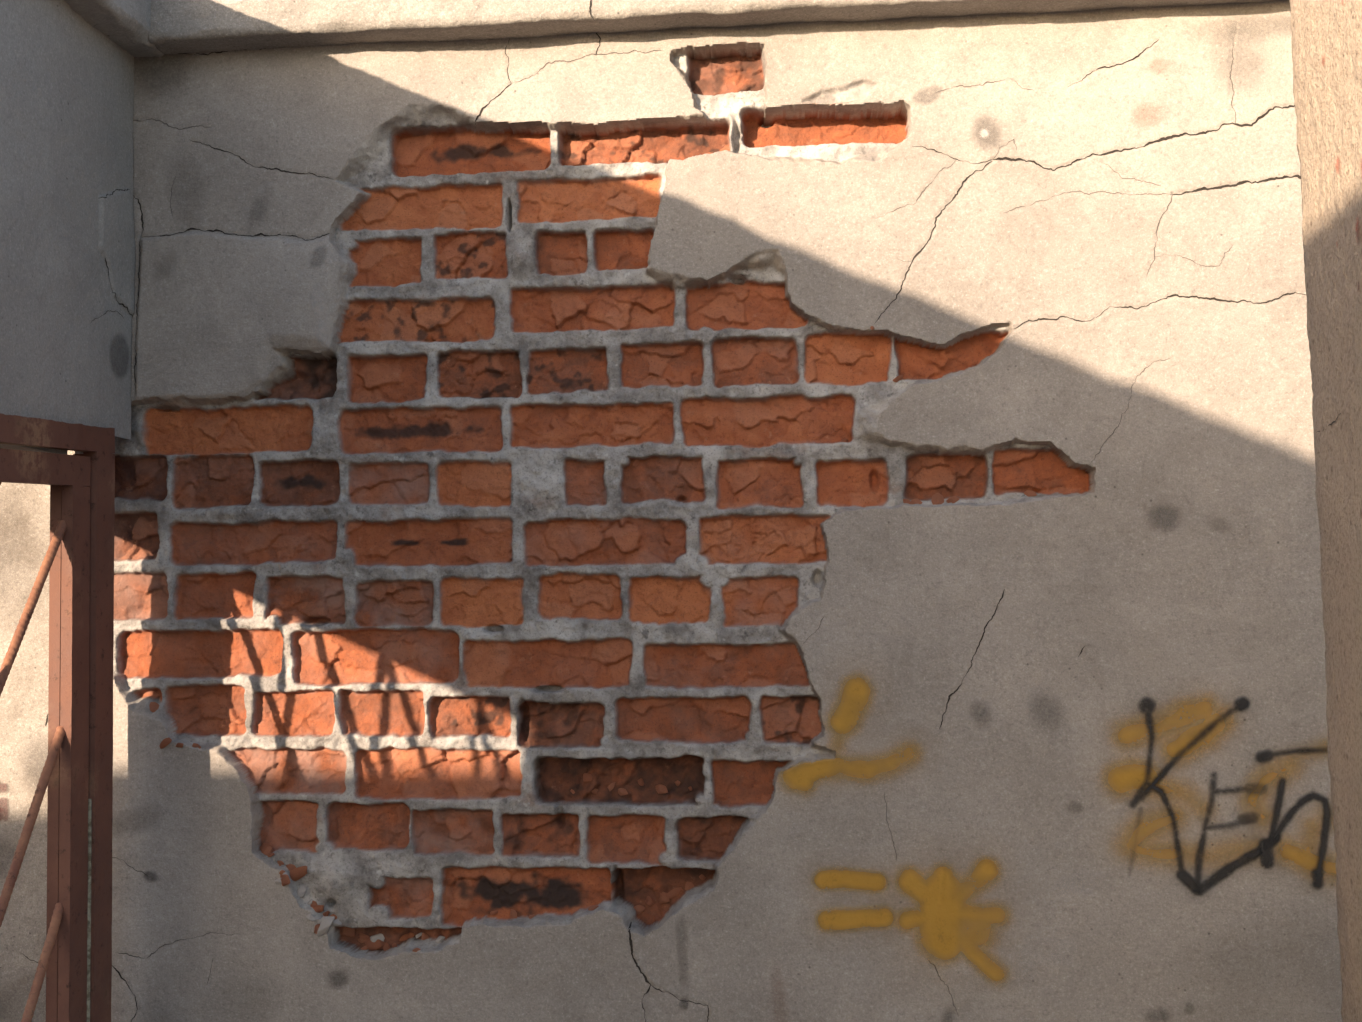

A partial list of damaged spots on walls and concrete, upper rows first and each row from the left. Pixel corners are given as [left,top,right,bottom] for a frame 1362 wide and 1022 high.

crack [475,0,662,124]
crack [133,119,331,179]
crack [875,31,1306,329]
crack [92,176,332,388]
crack [1094,357,1172,460]
spalling [112,41,1097,960]
crack [628,922,709,1022]